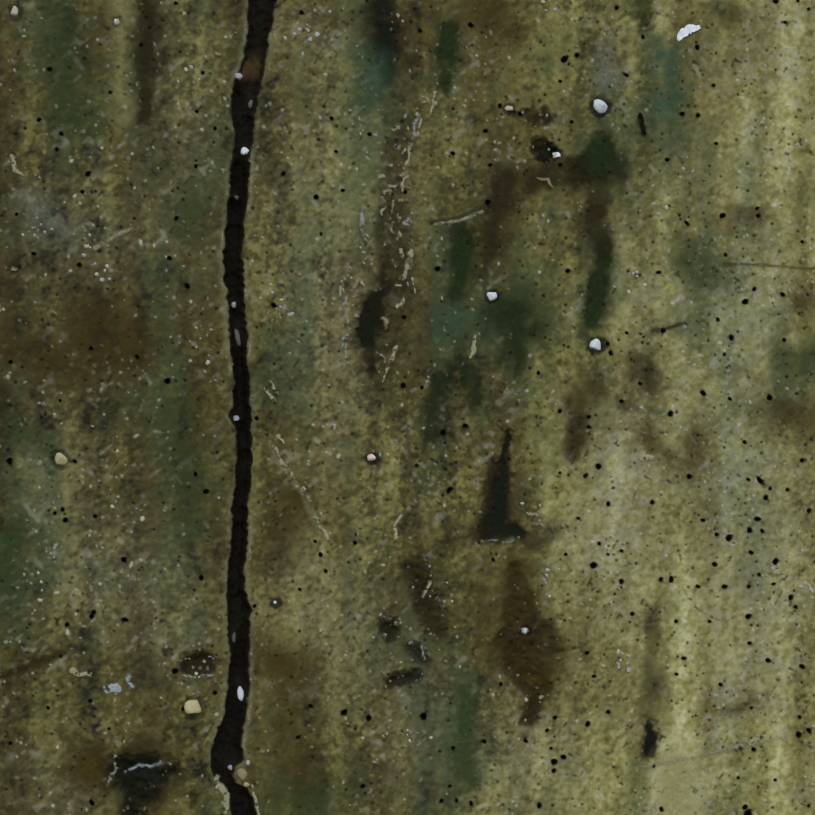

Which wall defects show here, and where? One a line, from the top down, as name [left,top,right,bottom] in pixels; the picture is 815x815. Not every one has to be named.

leakage [372,0,401,83]
leakage [356,266,391,374]
crack [210,0,277,815]
leakage [478,429,527,542]